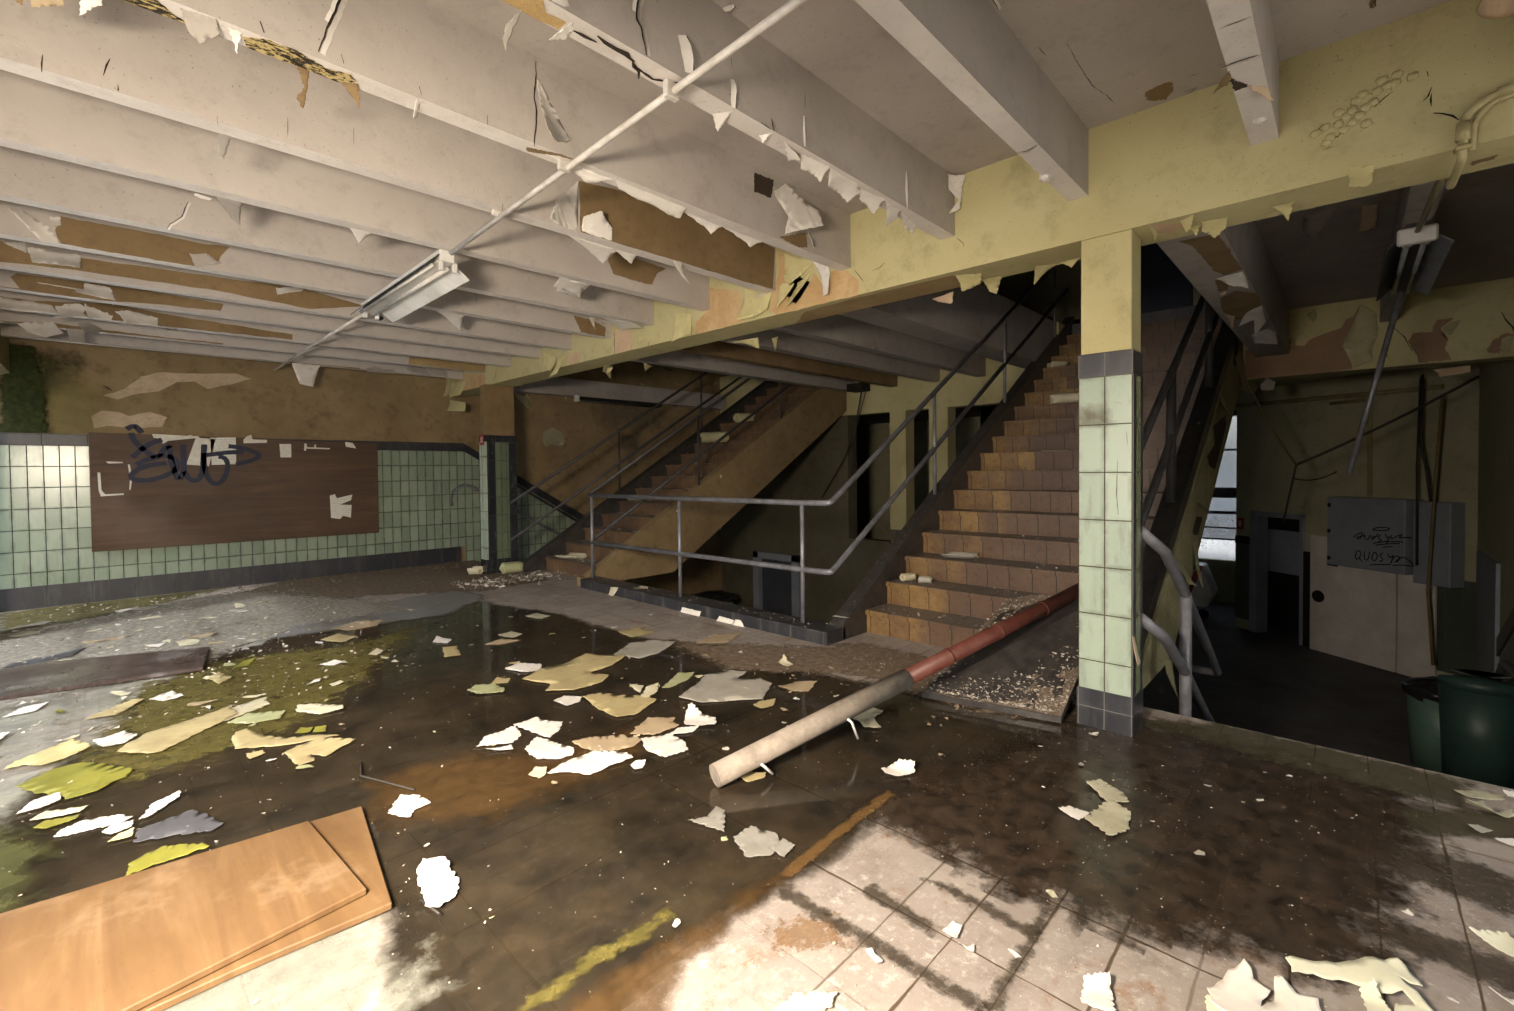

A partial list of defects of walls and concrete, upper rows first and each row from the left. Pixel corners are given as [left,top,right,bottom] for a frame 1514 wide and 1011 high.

peeling [16,0,102,15]
peeling [122,0,360,108]
crack [318,0,348,63]
crack [632,0,694,73]
crack [722,3,739,14]
peeling [712,111,733,132]
crack [730,58,806,147]
peeling [0,208,486,428]
peeling [526,133,1003,351]
peeling [1034,257,1080,285]
peeling [1148,215,1378,392]
peeling [1408,318,1471,377]